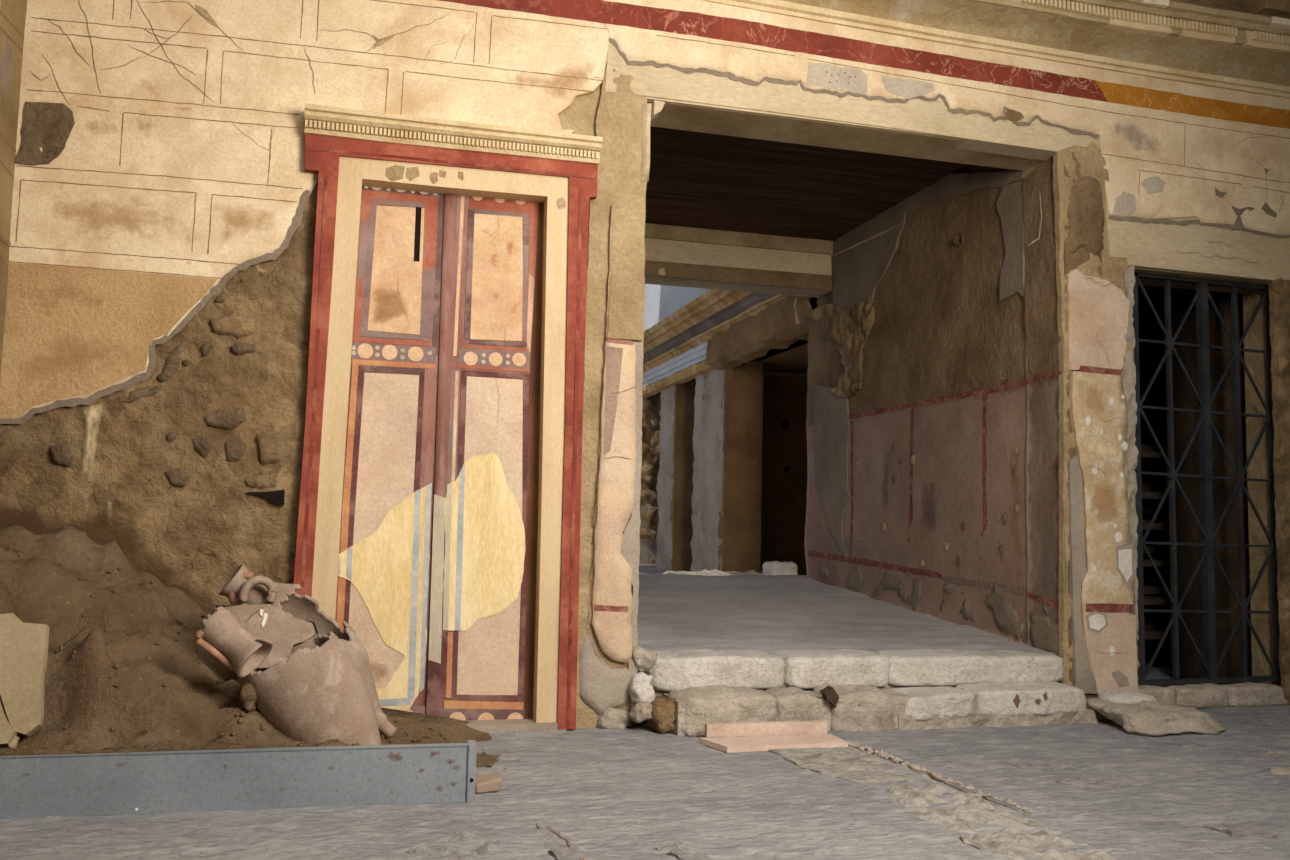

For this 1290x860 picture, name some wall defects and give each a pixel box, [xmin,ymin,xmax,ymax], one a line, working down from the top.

crack [32,1,274,171]
crack [304,10,474,92]
flaking render [806,62,935,99]
flaking render [15,101,75,166]
flaking render [1113,176,1166,216]
flaking render [811,297,875,398]
flaking render [0,181,318,615]